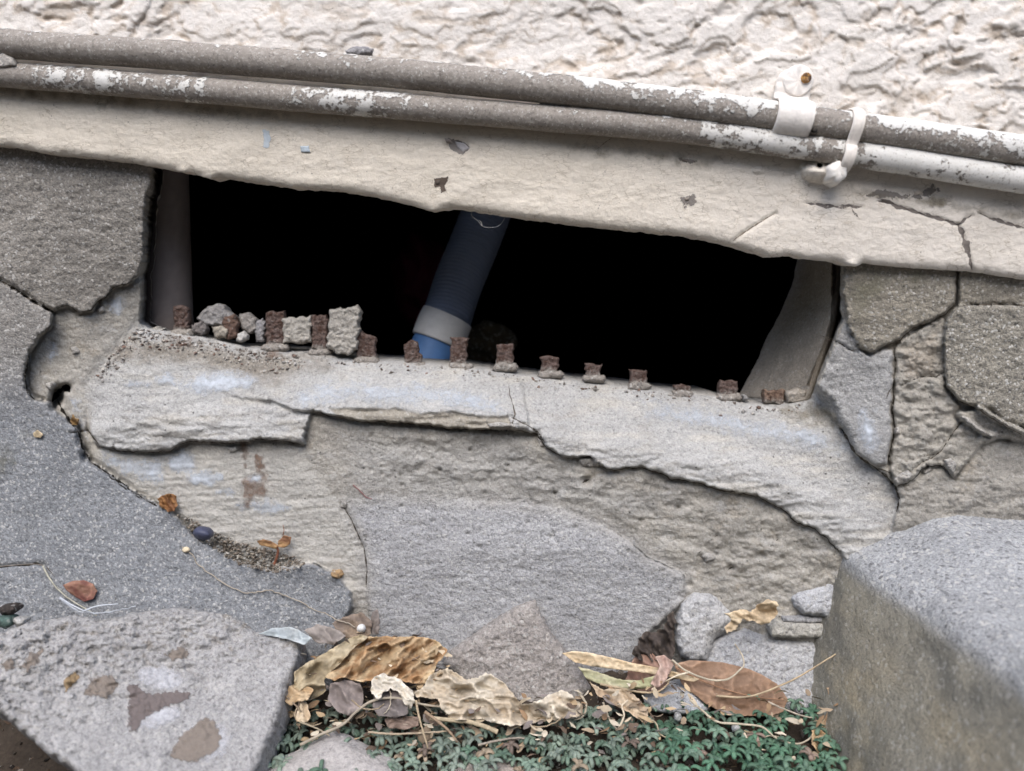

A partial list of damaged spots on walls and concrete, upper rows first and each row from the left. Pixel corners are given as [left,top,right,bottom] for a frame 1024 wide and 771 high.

peeling [210,43,374,69]
peeling [21,63,211,104]
peeling [271,85,448,120]
peeling [445,138,470,155]
peeling [485,68,1024,200]
peeling [434,176,448,193]
crack [808,198,1022,269]
crack [0,280,54,312]
crack [509,389,544,441]